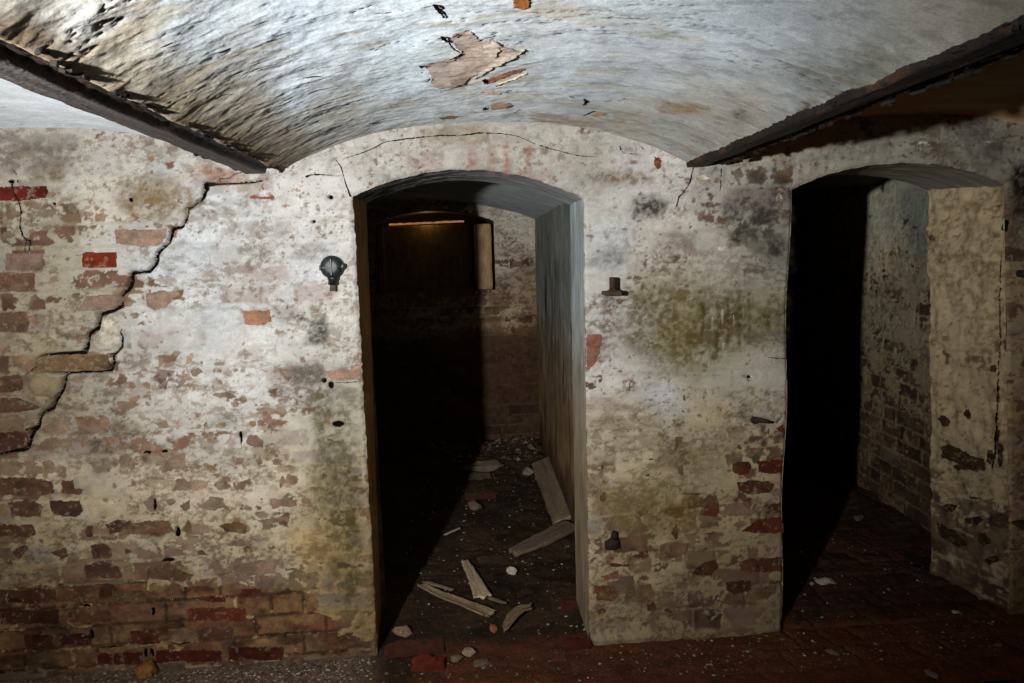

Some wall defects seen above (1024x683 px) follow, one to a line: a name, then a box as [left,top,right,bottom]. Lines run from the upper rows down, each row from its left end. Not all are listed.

flaking render [419,31,526,111]
flaking render [0,185,48,201]
crack [305,109,594,197]
flaking render [82,229,181,268]
crack [0,170,263,455]
flaking render [146,291,180,310]
flaking render [242,310,271,326]
damp [630,290,771,356]
crack [991,260,1001,468]
flaking render [732,459,784,534]
peeling [0,415,350,675]
flaking render [594,492,719,615]